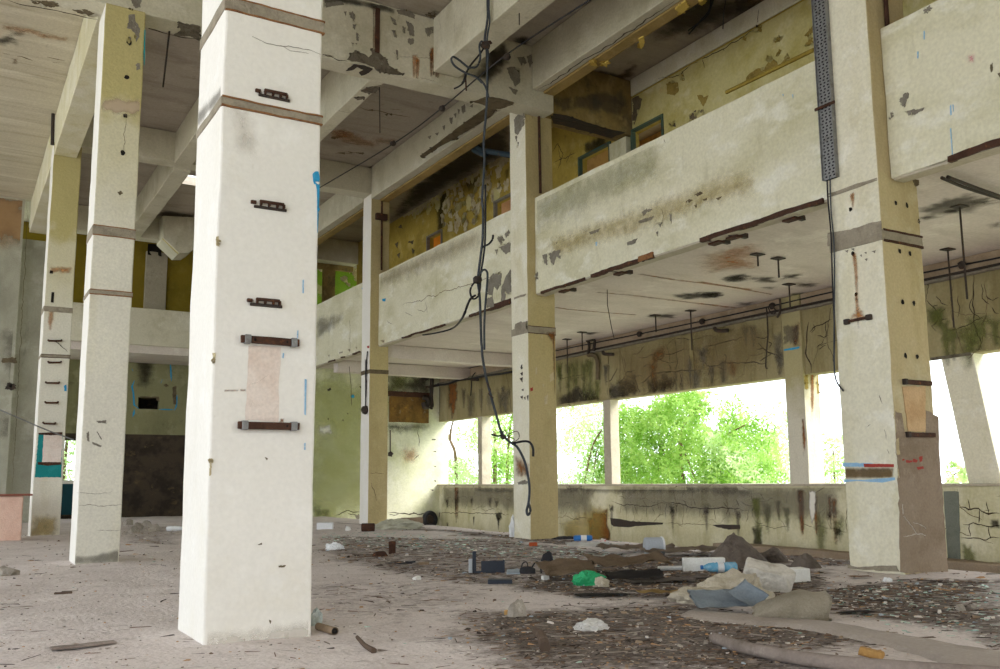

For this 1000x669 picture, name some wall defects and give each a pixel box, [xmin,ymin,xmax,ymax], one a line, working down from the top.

spalling [325,1,404,76]
peeling [390,9,438,45]
spalling [420,53,533,158]
peeling [889,92,924,120]
crack [925,282,1000,359]
crack [610,305,837,396]
damp [559,361,637,404]
mould [648,379,674,392]
crack [558,483,847,533]
damp [753,500,789,544]
damp [809,491,824,548]
crack [945,496,1000,544]